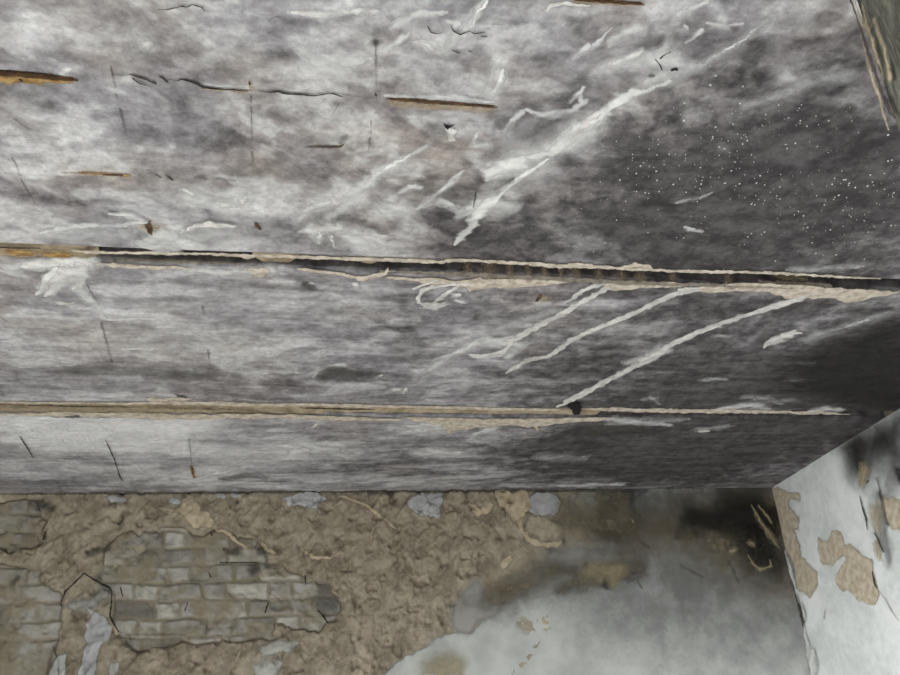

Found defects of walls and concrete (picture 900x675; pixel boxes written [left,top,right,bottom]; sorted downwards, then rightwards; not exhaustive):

damp [290,7,379,17]
damp [387,0,488,54]
damp [572,24,643,59]
damp [677,0,761,68]
crack [130,74,343,97]
damp [378,79,671,246]
damp [0,145,900,486]
peeling [282,492,327,509]
damp [25,470,790,621]
peeling [873,497,900,530]
spalling [0,497,341,675]
peeling [386,487,881,675]